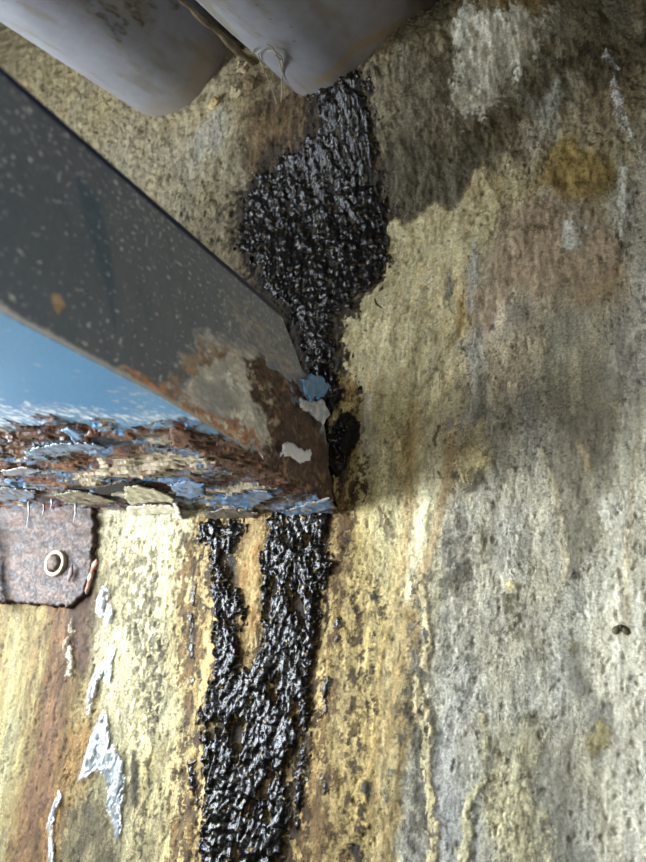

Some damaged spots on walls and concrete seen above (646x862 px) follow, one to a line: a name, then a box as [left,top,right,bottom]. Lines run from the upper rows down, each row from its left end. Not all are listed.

peeling [299,373,330,425]
peeling [24,426,107,457]
peeling [280,441,312,464]
leakage [159,25,646,862]
peeling [0,466,47,502]
peeling [54,480,207,520]
peeling [205,490,276,520]
peeling [281,497,336,515]
leakage [108,520,173,859]
rust [0,559,99,862]
leakage [54,782,121,862]